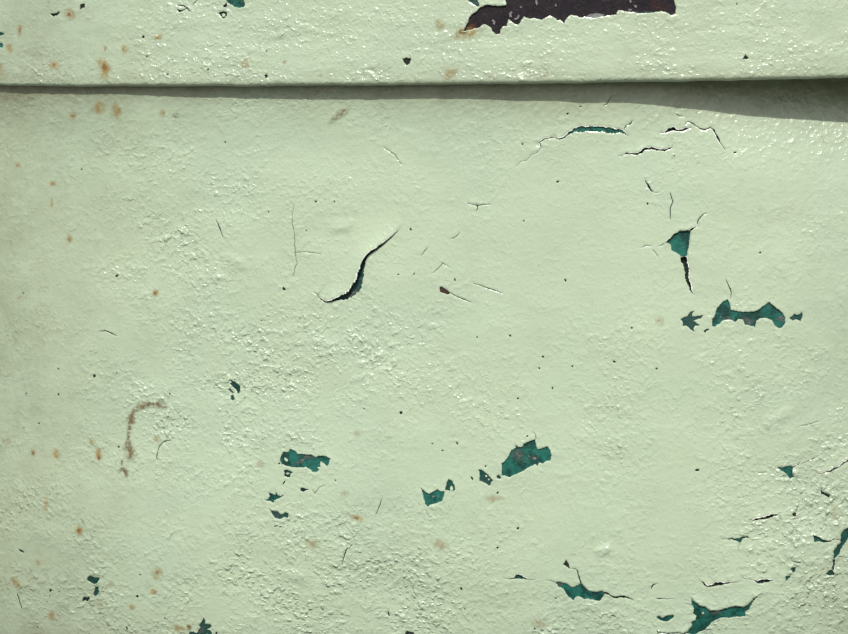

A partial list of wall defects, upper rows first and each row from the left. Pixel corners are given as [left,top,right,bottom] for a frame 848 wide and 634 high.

peeling [218,0,245,18]
peeling [462,0,676,34]
crack [518,114,725,165]
peeling [644,213,707,295]
peeling [680,280,803,333]
peeling [278,449,331,484]
peeling [471,433,552,486]
peeling [264,492,289,527]
peeling [420,479,456,507]
peeling [549,560,633,602]
peeling [189,618,217,634]
peeling [657,594,762,634]